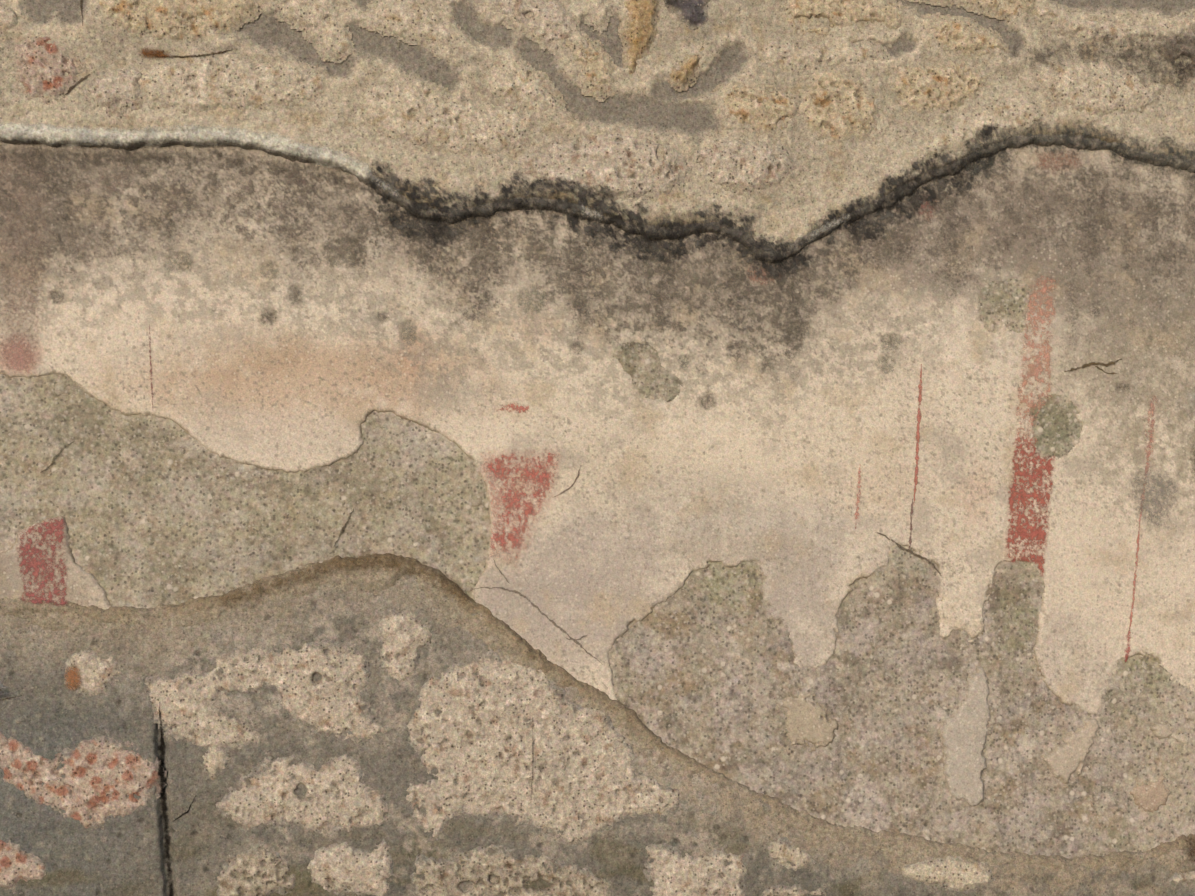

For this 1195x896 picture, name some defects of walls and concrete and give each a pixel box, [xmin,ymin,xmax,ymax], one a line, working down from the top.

water stain [0,121,1195,368]
flaking render [0,373,491,608]
flaking render [1029,394,1083,461]
crack [158,706,196,896]
flaking render [609,544,1195,858]